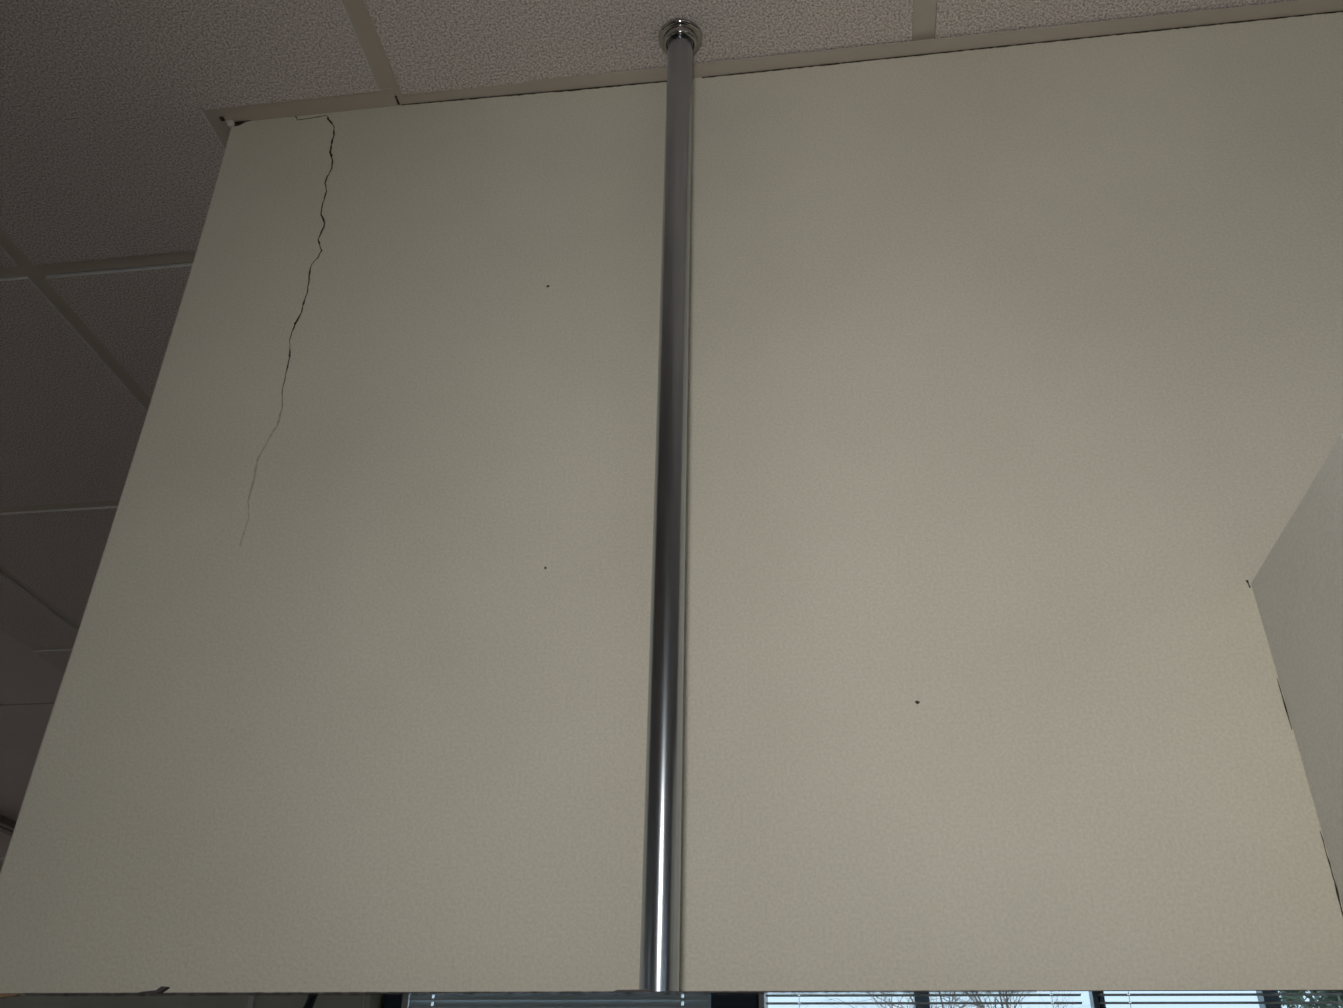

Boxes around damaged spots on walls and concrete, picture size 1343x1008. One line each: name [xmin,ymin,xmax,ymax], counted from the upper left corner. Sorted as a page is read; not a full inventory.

crack [239,115,335,546]